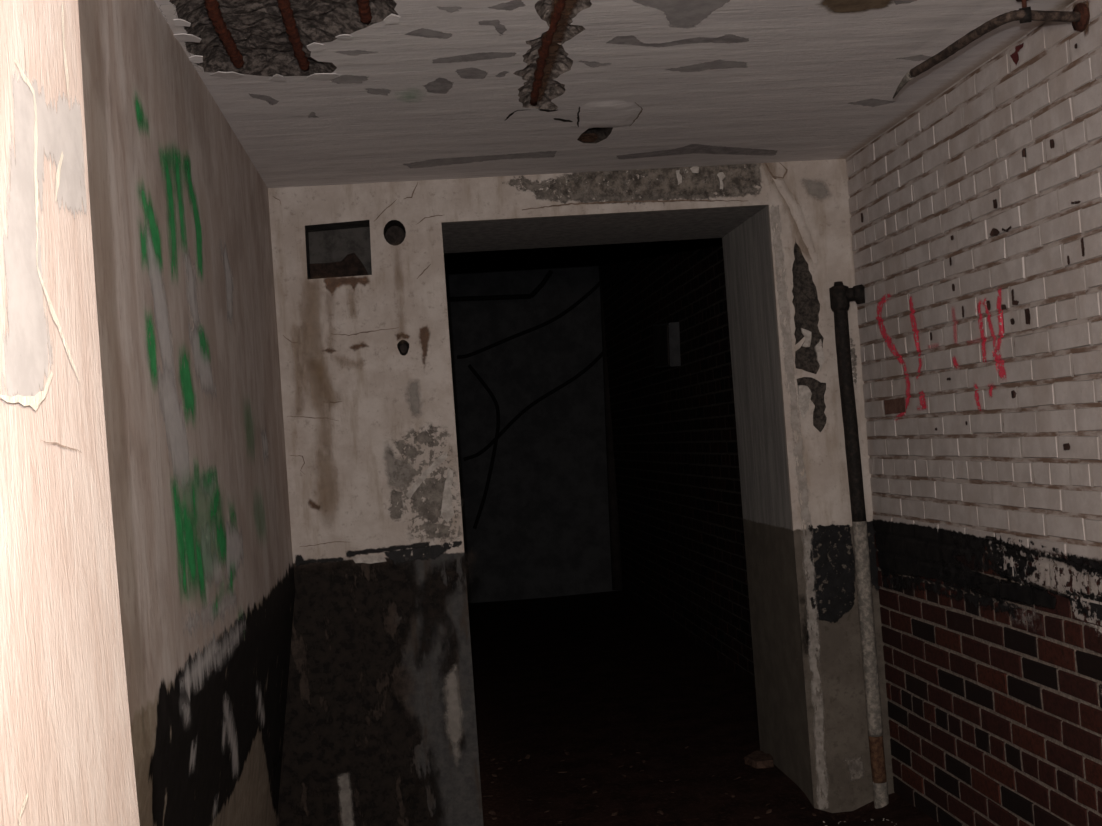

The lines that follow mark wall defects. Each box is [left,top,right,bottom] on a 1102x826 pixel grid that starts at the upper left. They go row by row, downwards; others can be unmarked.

spalling [160,0,452,95]
spalling [424,0,609,120]
peeling [403,151,556,168]
flaking render [508,144,777,204]
peeling [2,70,87,406]
peeling [986,289,1030,325]
flaking render [884,397,905,415]
flaking render [770,206,855,809]
peeling [149,425,462,826]
peeling [867,519,1102,633]
leakage [278,551,474,826]